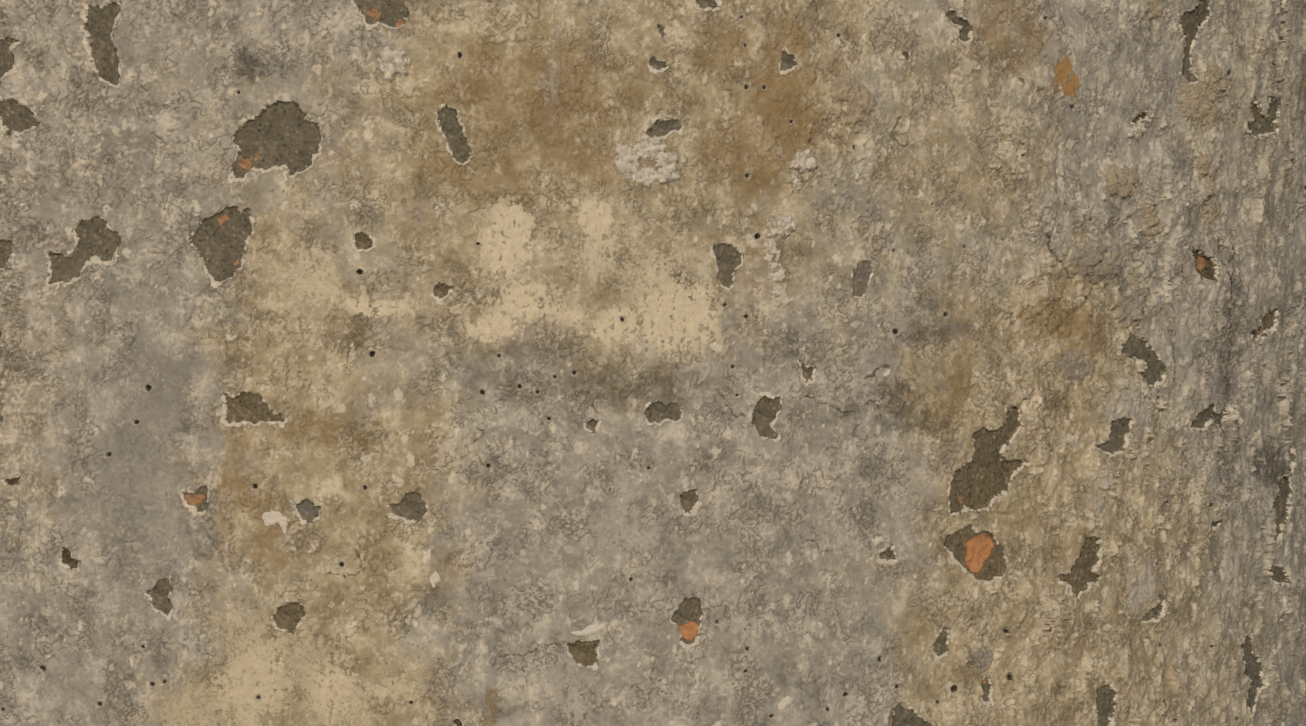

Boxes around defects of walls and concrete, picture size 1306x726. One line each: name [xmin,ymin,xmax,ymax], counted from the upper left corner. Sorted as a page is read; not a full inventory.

spalling [79,0,123,90]
spalling [351,0,409,30]
spalling [228,99,323,184]
spalling [44,216,121,290]
spalling [189,206,255,288]
spalling [219,389,288,428]
spalling [751,392,783,443]
spalling [1093,416,1136,458]
spalling [944,404,1032,585]
spalling [1057,535,1103,602]
spalling [669,597,704,650]